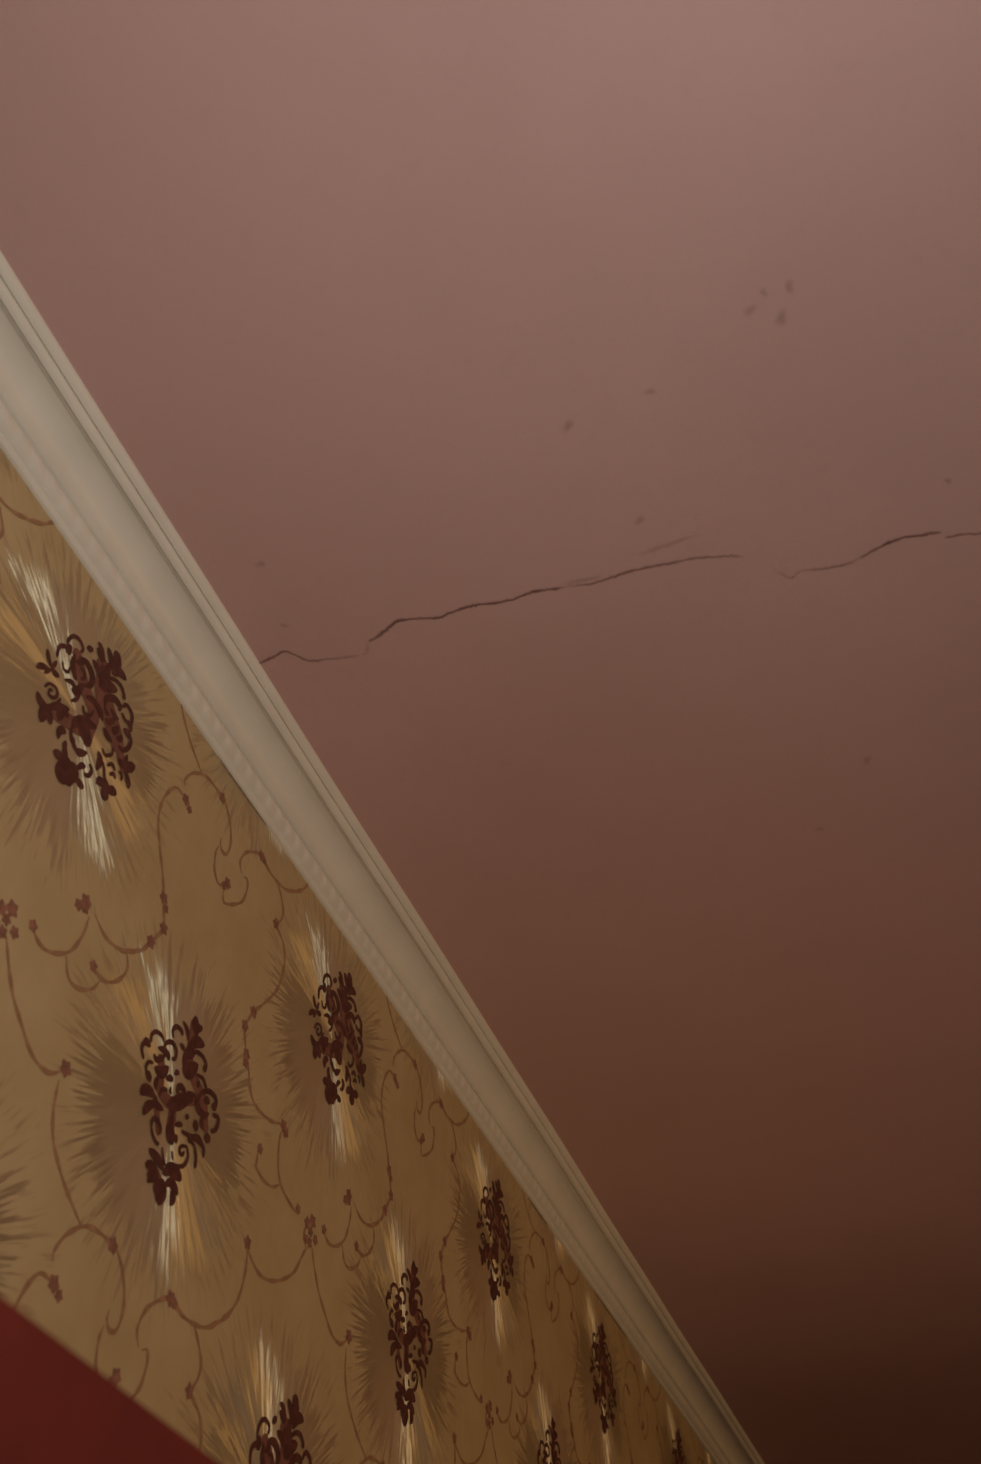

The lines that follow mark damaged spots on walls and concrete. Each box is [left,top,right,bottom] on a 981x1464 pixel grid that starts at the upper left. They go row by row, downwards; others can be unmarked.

crack [381,588,557,634]